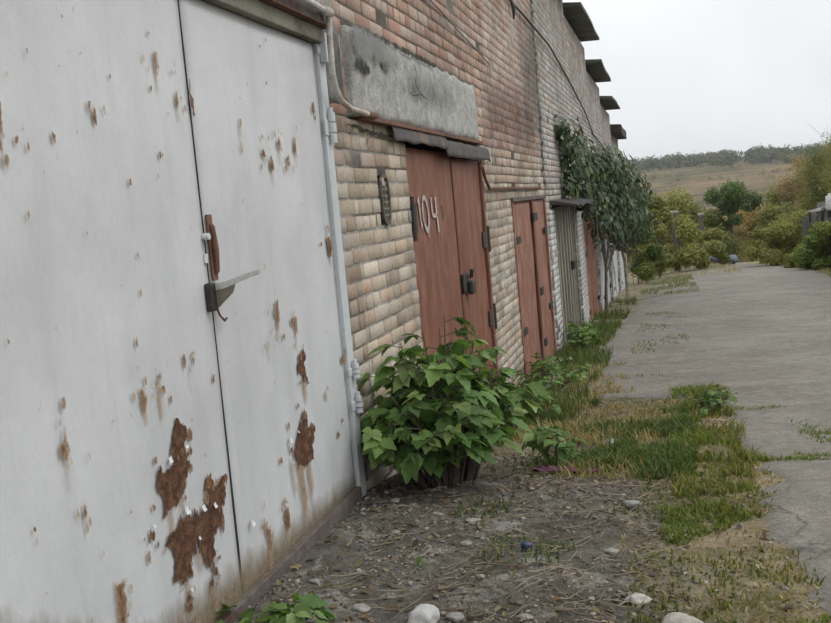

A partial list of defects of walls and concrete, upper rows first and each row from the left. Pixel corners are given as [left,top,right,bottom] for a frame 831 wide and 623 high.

corrosion [175,79,195,116]
corrosion [0,102,9,168]
corrosion [261,126,297,172]
corrosion [265,300,285,349]
corrosion [291,311,309,395]
corrosion [133,373,172,418]
corrosion [59,420,72,465]
corrosion [279,403,315,513]
corrosion [144,418,228,623]
corrosion [115,580,133,623]